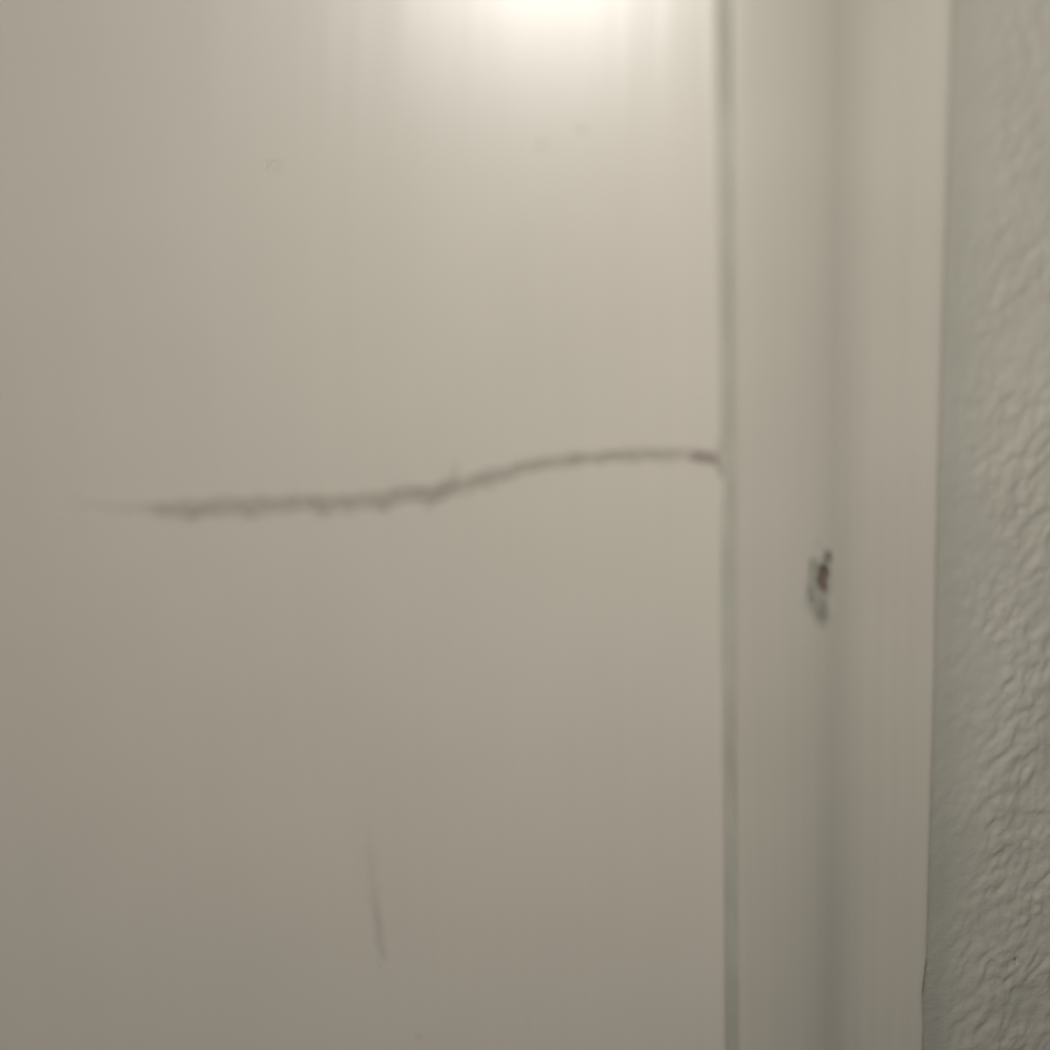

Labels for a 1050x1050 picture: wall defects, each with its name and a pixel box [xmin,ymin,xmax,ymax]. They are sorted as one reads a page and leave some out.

crack [696,453,713,461]